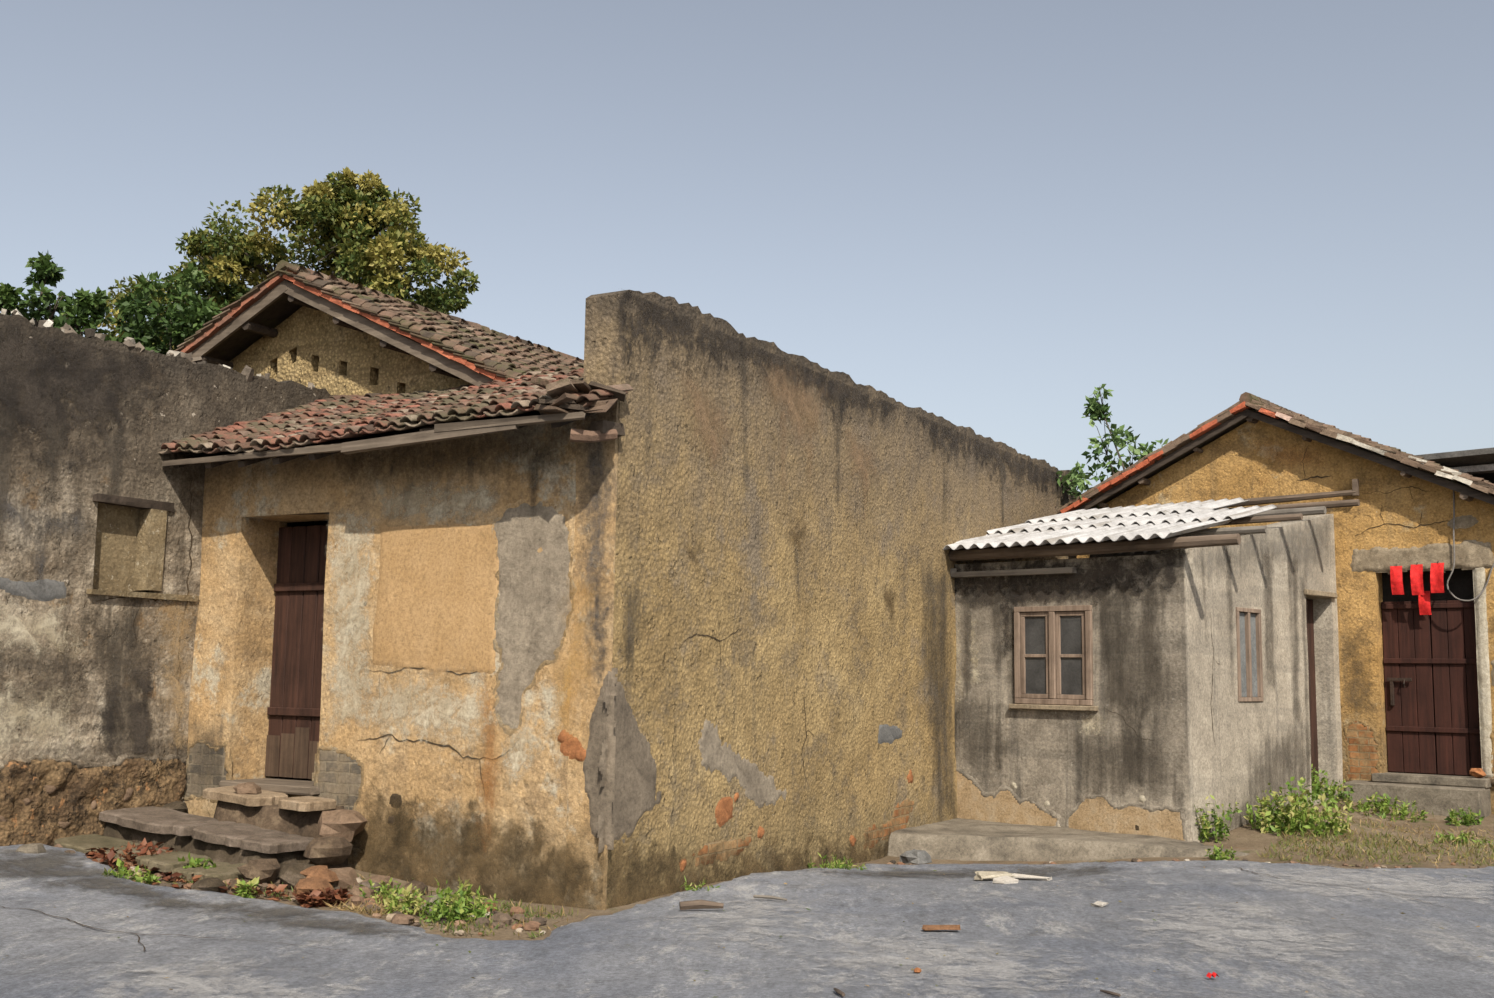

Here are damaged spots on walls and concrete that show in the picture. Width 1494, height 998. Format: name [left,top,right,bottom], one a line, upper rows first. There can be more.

water stain [0,327,172,511]
water stain [0,604,79,751]
water stain [100,602,220,780]
crack [358,734,519,793]
peeling [502,727,533,777]
spalling [557,729,586,761]
water stain [351,793,990,909]
water stain [1017,866,1110,876]
peeling [956,767,1193,842]
water stain [925,524,1329,826]